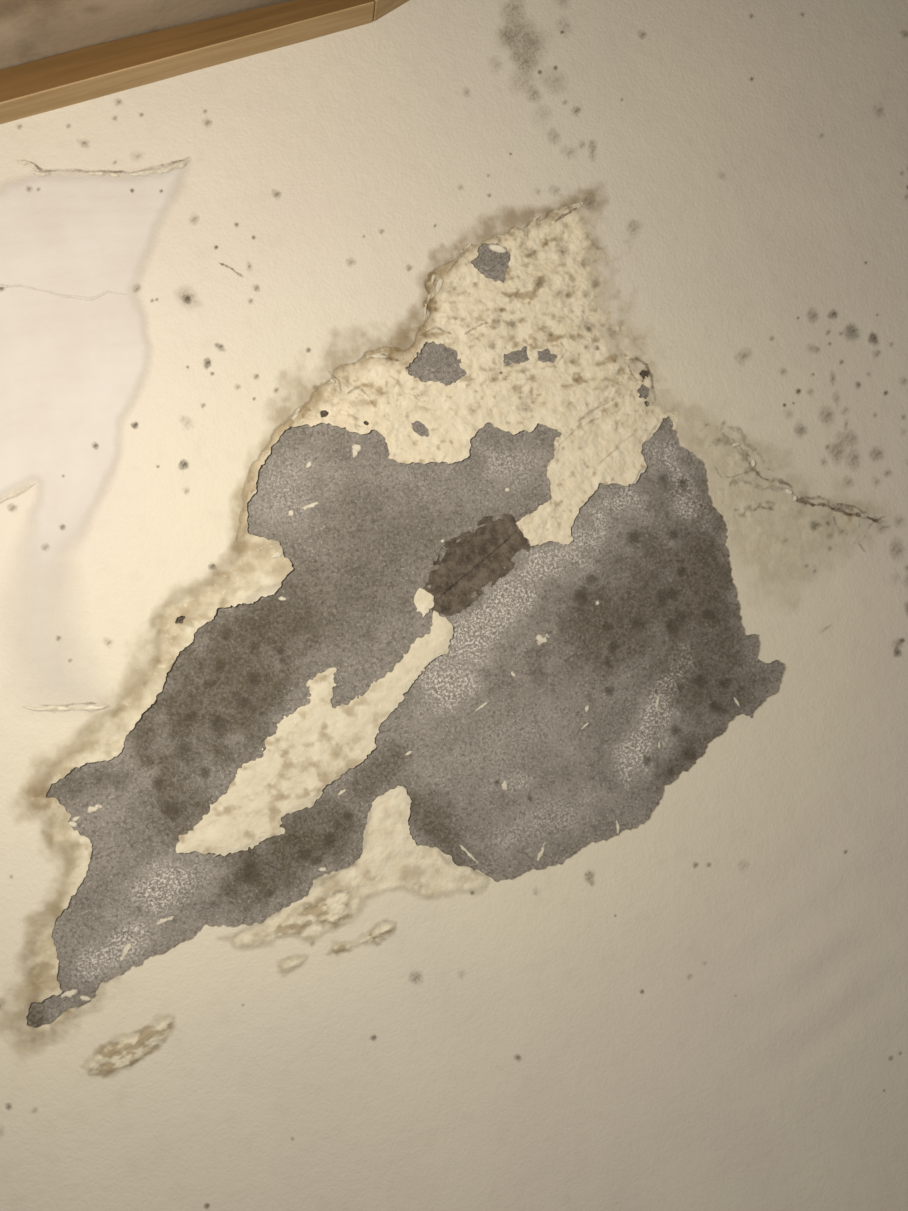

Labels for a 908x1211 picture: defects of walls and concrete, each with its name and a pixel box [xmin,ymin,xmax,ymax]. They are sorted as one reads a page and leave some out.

spalling [17,202,869,1036]
crack [733,442,878,522]